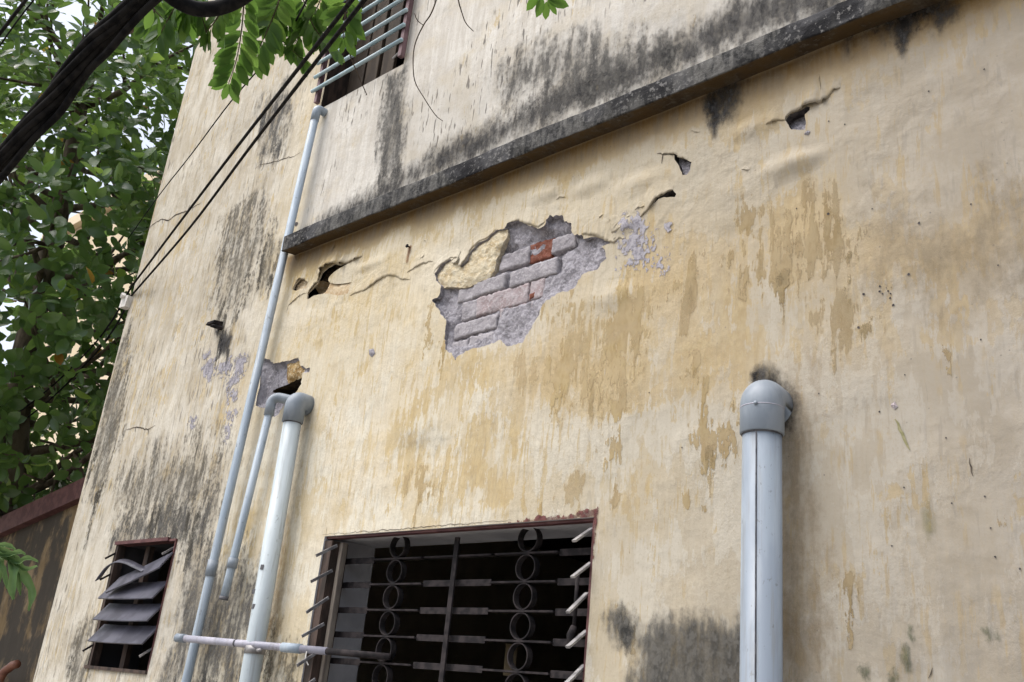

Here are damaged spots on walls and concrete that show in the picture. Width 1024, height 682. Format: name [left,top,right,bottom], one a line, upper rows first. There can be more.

leakage [874,1,956,53]
leakage [322,0,840,218]
spalling [661,140,691,175]
spalling [766,74,840,135]
leakage [216,192,280,328]
spalling [285,179,676,379]
leakage [87,322,132,540]
spalling [256,358,310,417]
peeling [508,255,704,559]
leakage [752,366,795,427]
leakage [109,426,257,682]
leakage [607,605,740,682]